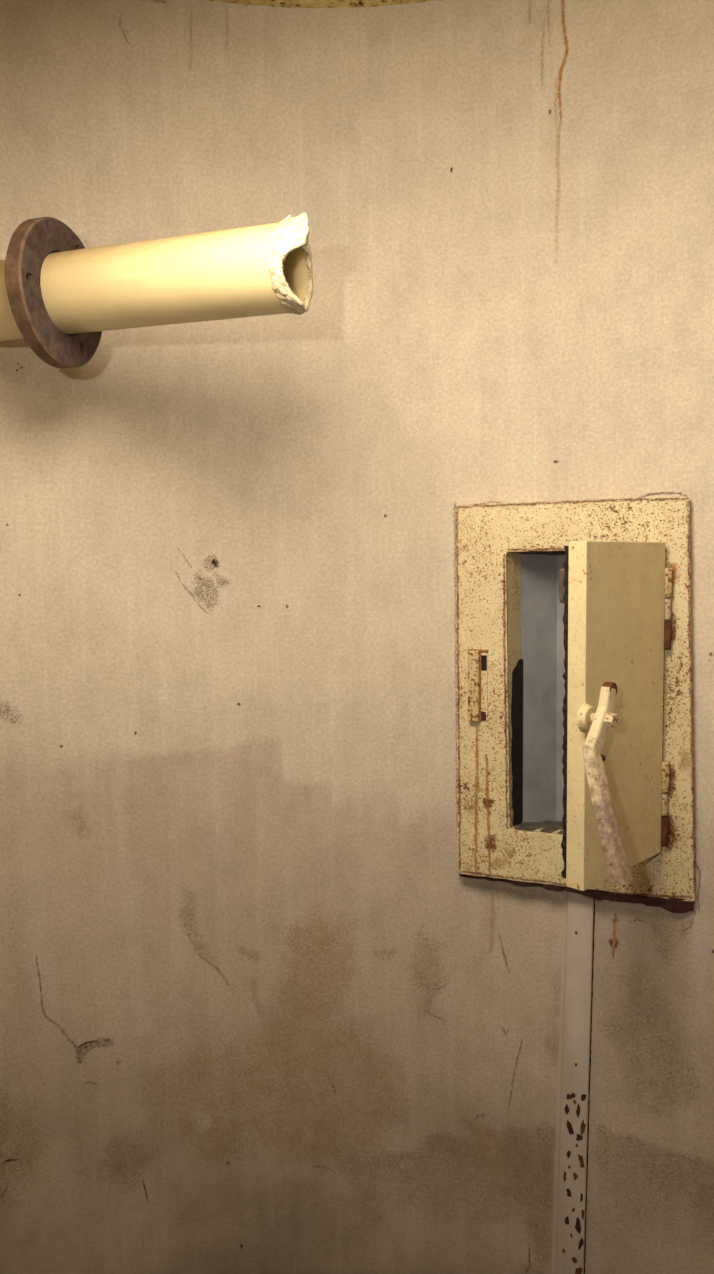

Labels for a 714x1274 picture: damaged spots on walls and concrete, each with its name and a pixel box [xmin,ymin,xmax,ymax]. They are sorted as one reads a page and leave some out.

corrosion [528,0,569,264]
crack [36,955,121,1085]